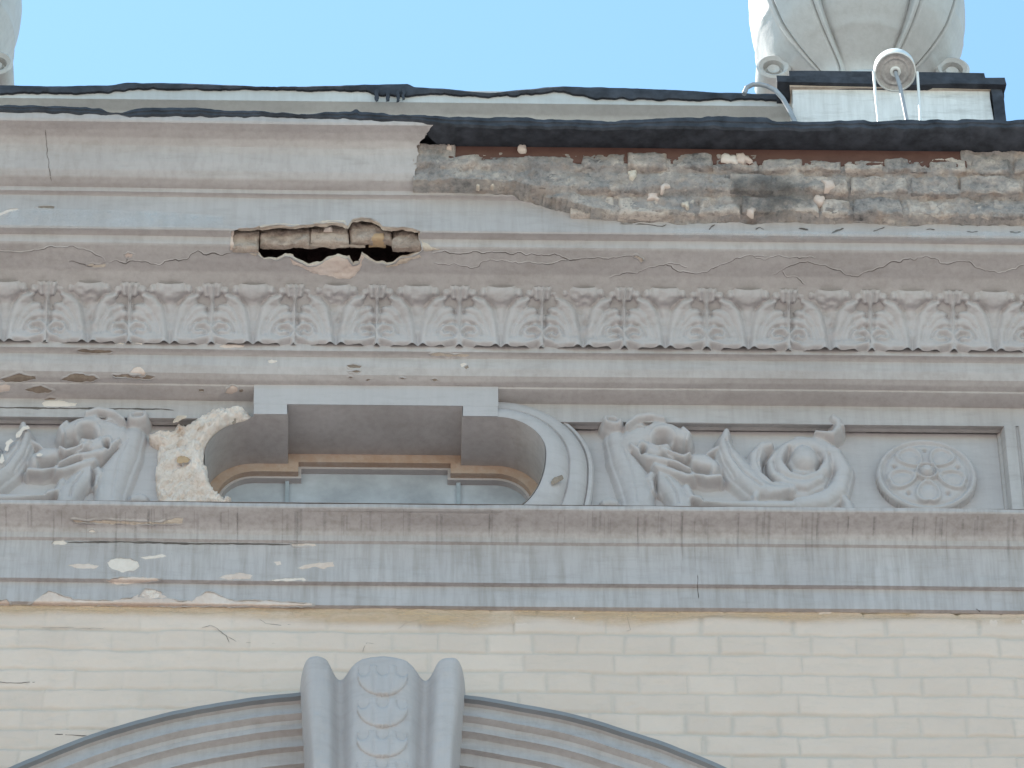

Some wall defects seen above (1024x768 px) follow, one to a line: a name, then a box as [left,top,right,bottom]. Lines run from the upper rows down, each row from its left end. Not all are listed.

flaking render [412,125,1024,233]
crack [0,245,232,267]
spalling [229,216,440,279]
crack [432,250,1024,285]
peeling [0,365,158,408]
spalling [149,384,251,502]
peeling [27,552,316,609]
peeling [269,560,337,583]